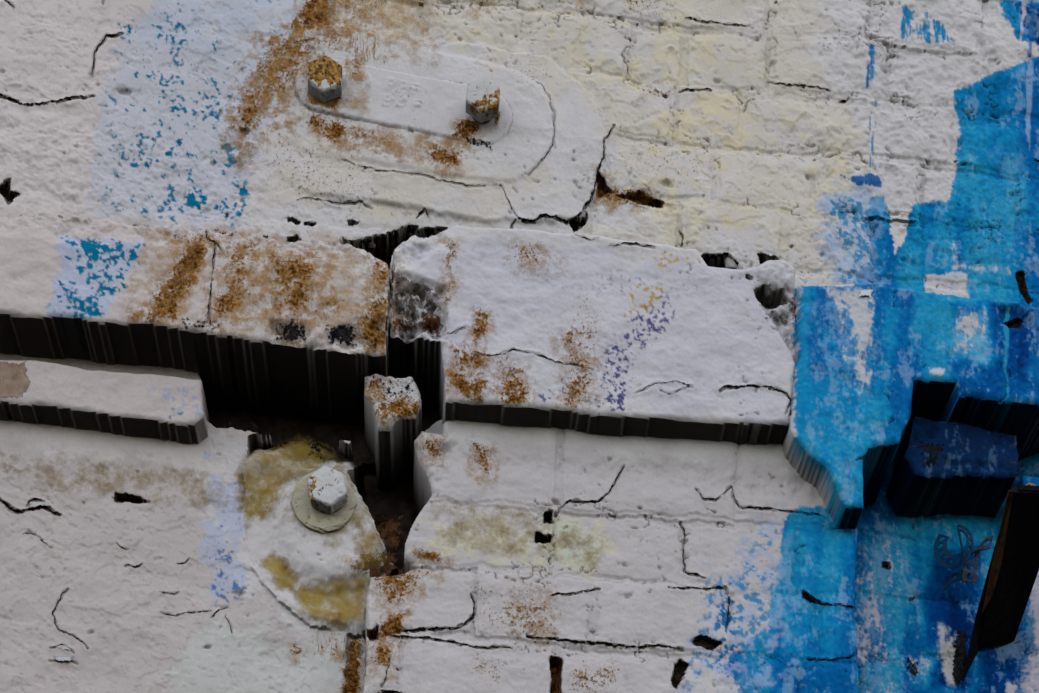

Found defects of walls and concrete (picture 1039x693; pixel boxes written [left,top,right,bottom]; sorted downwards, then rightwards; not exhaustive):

crack [0,32,121,106]
corrosion [228,0,411,224]
crack [343,125,653,247]
corrosion [131,231,210,327]
peeling [325,323,357,346]
spalling [391,274,446,337]
corrosion [447,308,533,406]
water stain [238,443,342,516]
crack [0,498,60,548]
water stain [263,555,370,628]
corrosion [289,513,446,693]
peeling [952,630,968,686]